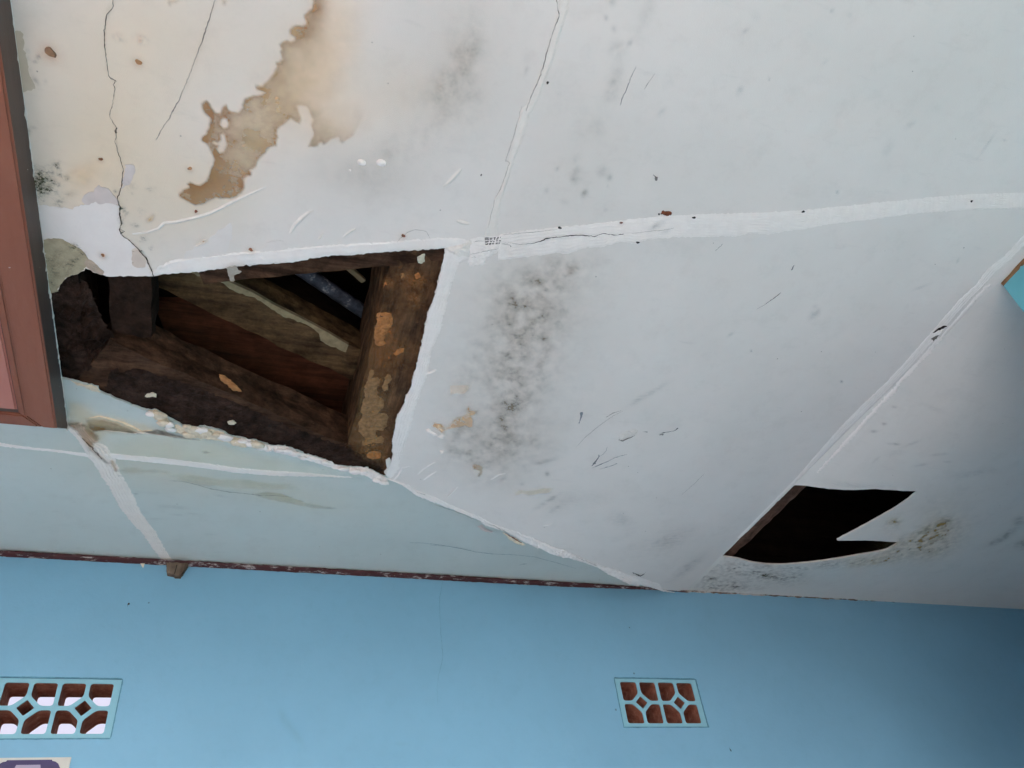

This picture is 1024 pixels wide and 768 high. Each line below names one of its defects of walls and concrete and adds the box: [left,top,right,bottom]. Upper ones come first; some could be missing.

crack [104,3,154,277]
crack [157,1,215,138]
water stain [180,61,297,205]
water stain [282,0,320,48]
crack [472,0,672,258]
peeling [84,258,104,275]
peeling [226,266,242,282]
flaking render [145,392,391,485]